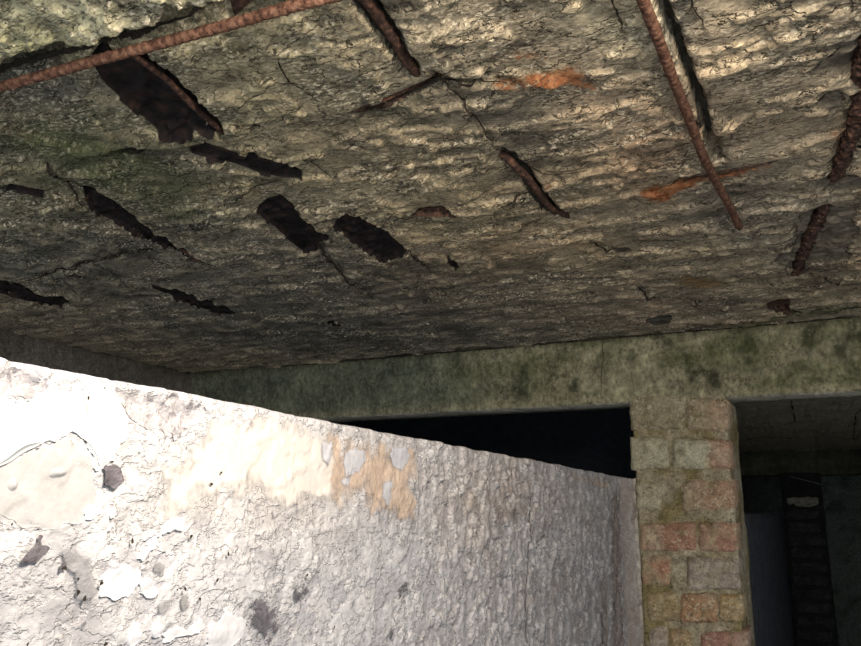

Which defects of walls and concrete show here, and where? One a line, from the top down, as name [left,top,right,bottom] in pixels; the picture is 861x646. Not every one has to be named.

corrosion [230,0,251,16]
spalling [0,0,443,181]
corrosion [495,68,596,91]
spalling [498,147,570,219]
corrosion [640,166,770,203]
spalling [257,195,407,263]
spalling [0,280,70,309]
spalling [152,285,235,315]
peeling [390,447,410,470]
peeling [0,364,366,601]